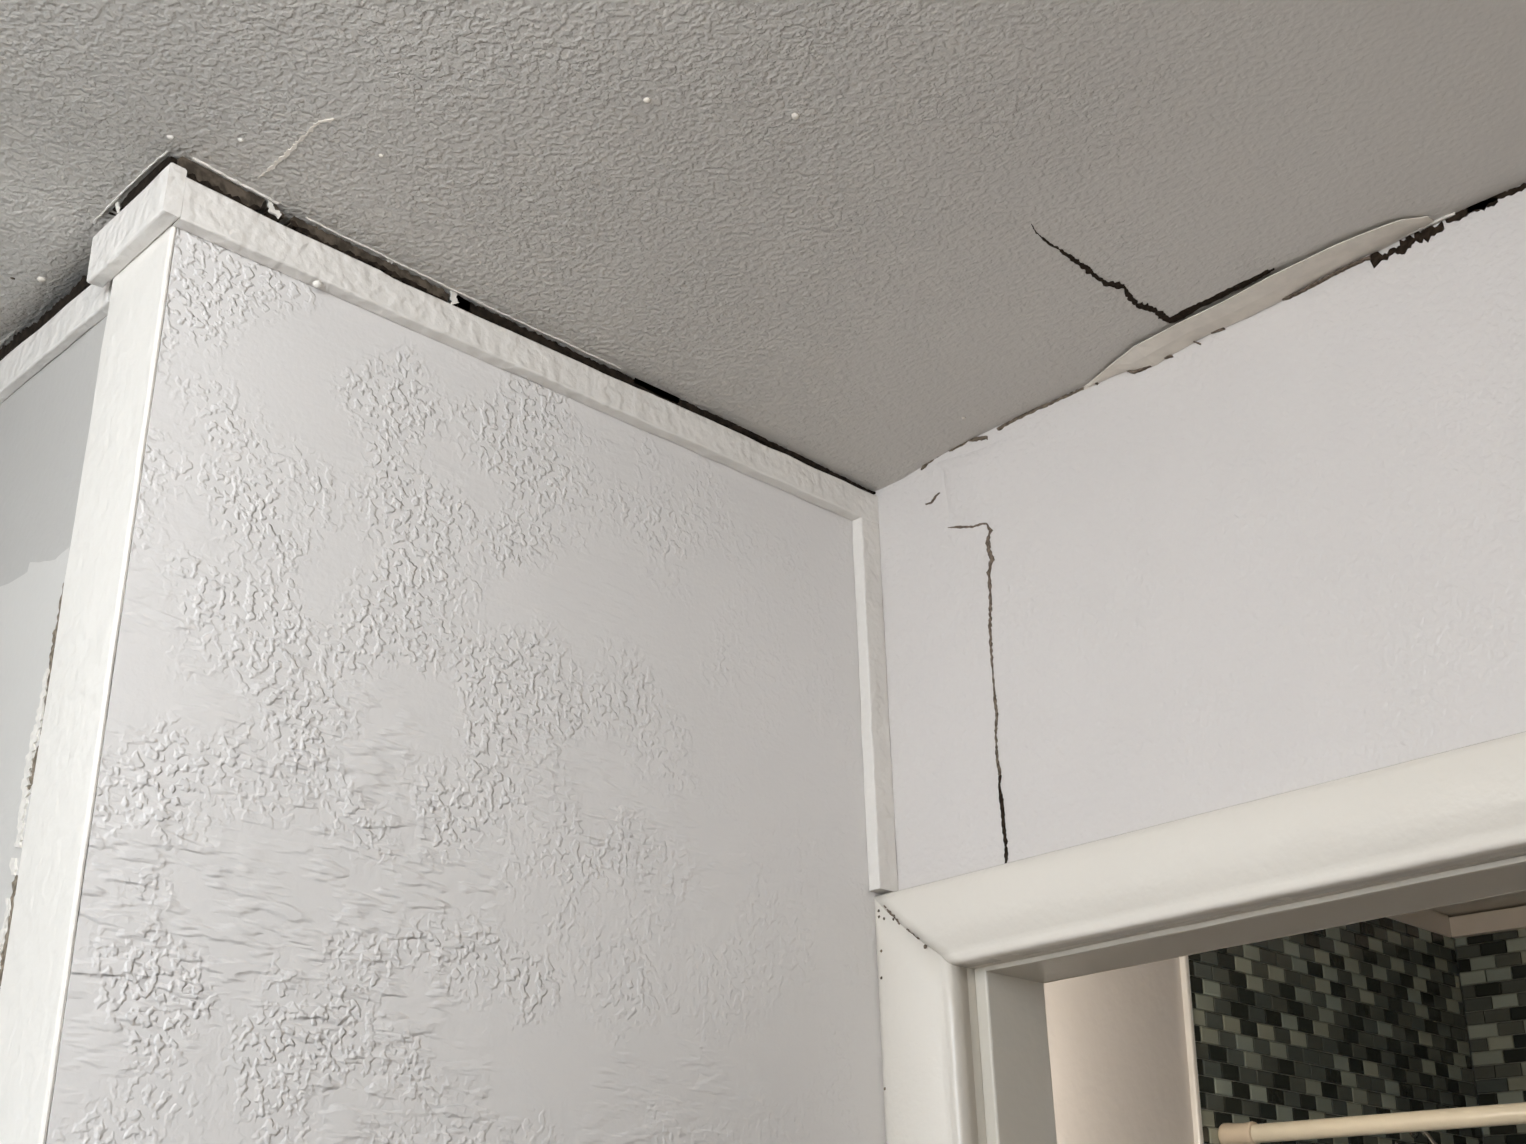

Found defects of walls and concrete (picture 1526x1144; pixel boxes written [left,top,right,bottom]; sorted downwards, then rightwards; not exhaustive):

crack [0,273,91,361]
crack [93,151,876,494]
crack [921,224,1371,863]